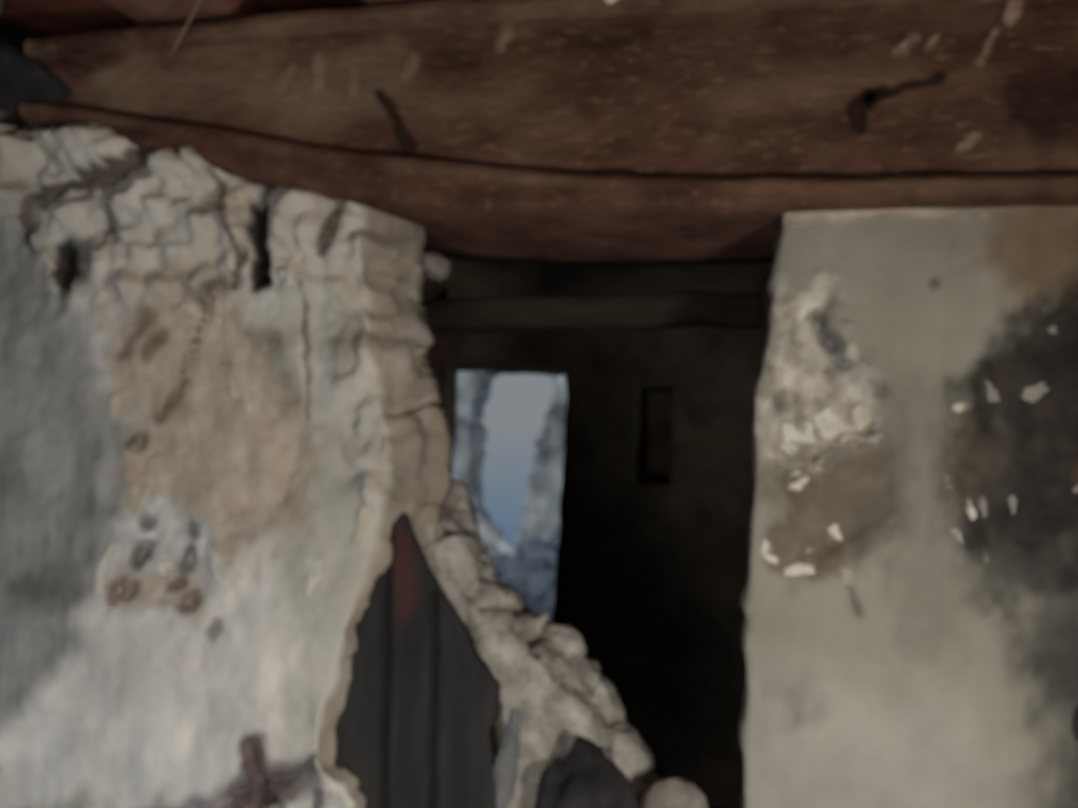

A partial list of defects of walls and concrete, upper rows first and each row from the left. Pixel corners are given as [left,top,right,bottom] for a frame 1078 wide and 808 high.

spalling [40,240,91,304]
crack [19,149,151,251]
crack [181,168,247,374]
spalling [224,189,293,290]
peeling [93,270,315,613]
spalling [755,270,908,586]
crack [183,738,324,808]